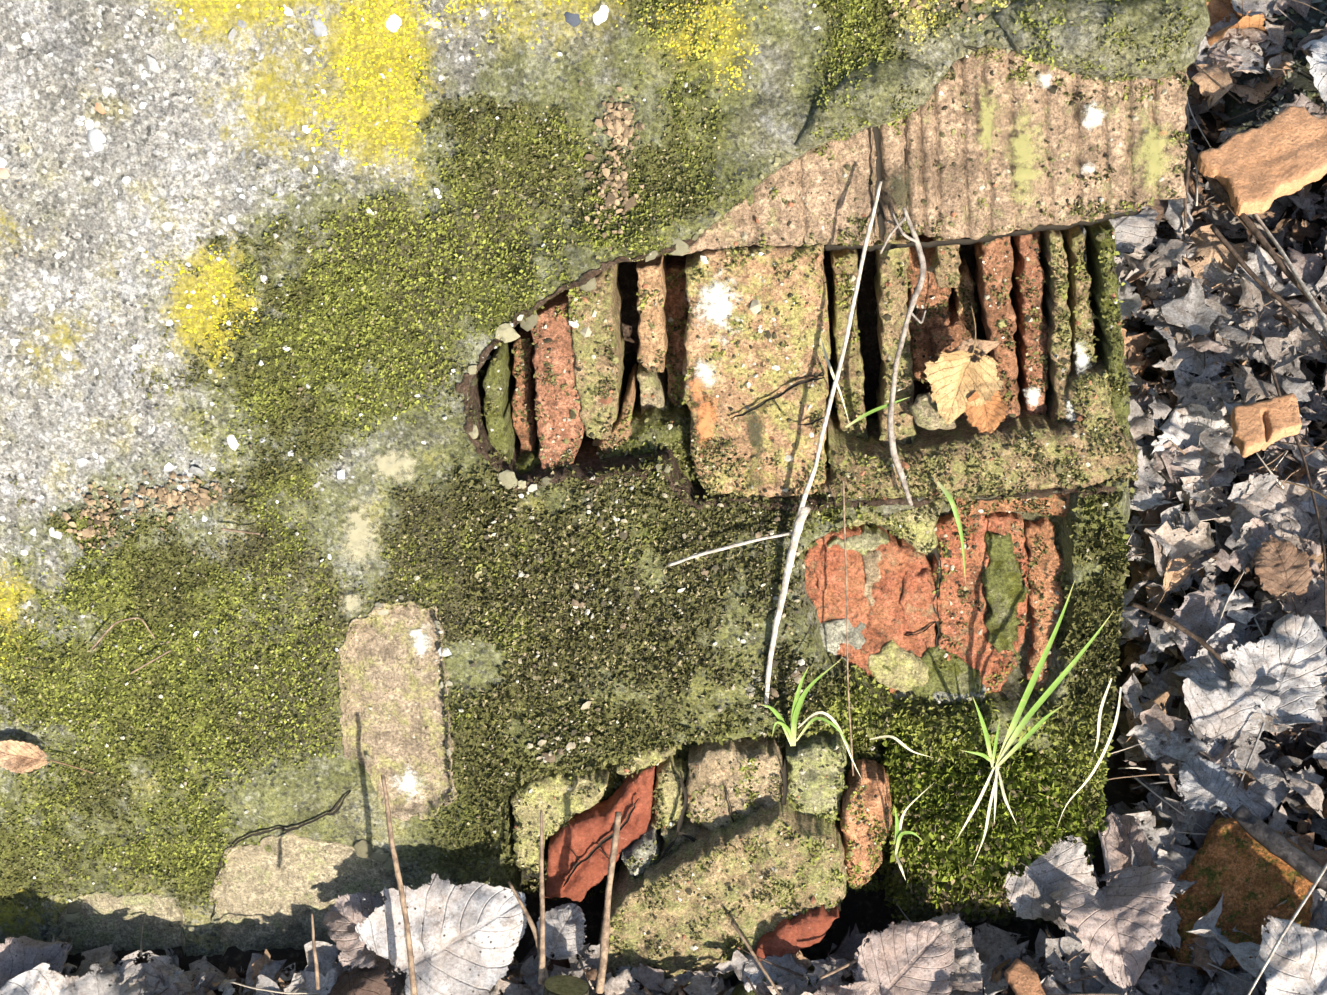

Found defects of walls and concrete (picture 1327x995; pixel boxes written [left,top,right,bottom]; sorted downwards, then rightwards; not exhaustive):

spalling [456,233,1117,512]
spalling [804,524,982,699]
spalling [981,531,1027,660]
spalling [545,766,655,902]
spalling [754,905,839,961]